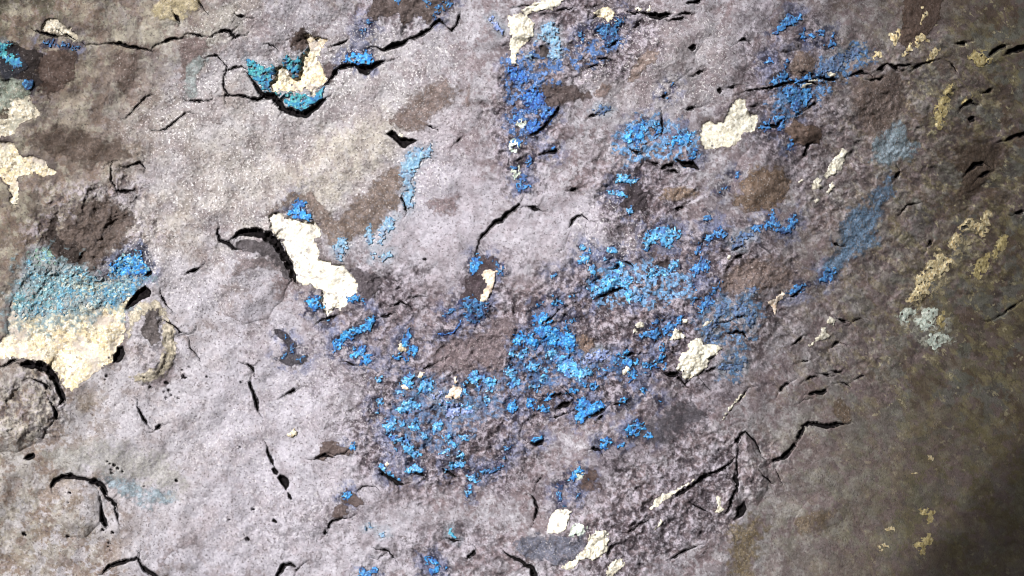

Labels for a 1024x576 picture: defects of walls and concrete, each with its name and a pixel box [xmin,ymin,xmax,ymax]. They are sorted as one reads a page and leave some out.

spalling [0,41,56,204]
crack [36,0,460,131]
spalling [246,34,327,112]
spalling [622,13,882,160]
crack [0,359,65,418]
spalling [0,247,150,391]
crack [51,473,120,529]
crack [217,223,296,283]
spalling [269,198,376,366]
crack [475,196,540,259]
peeling [375,209,798,497]
crack [607,316,864,559]